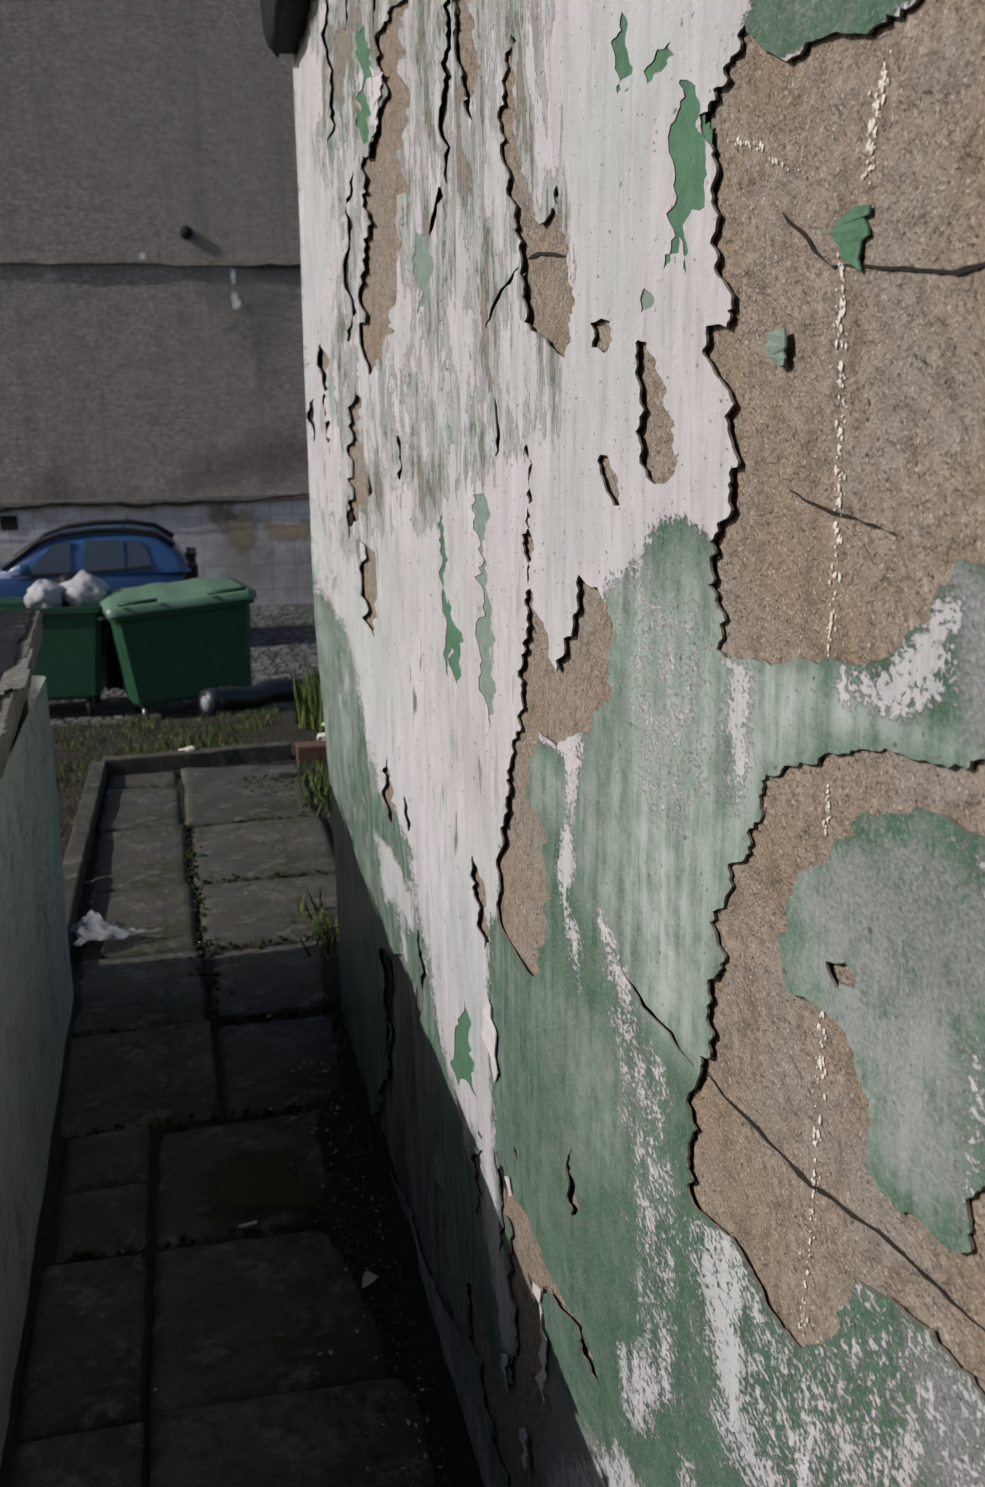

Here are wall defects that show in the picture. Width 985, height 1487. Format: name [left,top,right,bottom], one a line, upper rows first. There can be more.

spalling [347,394,378,634]
spalling [356,0,434,374]
peeling [438,493,496,724]
spalling [499,37,575,357]
peeling [612,13,674,92]
spalling [637,341,677,484]
spalling [665,0,985,665]
crack [782,212,985,276]
spalling [471,577,613,976]
spalling [377,948,599,1487]
spalling [688,749,985,1395]
crack [703,1069,985,1332]